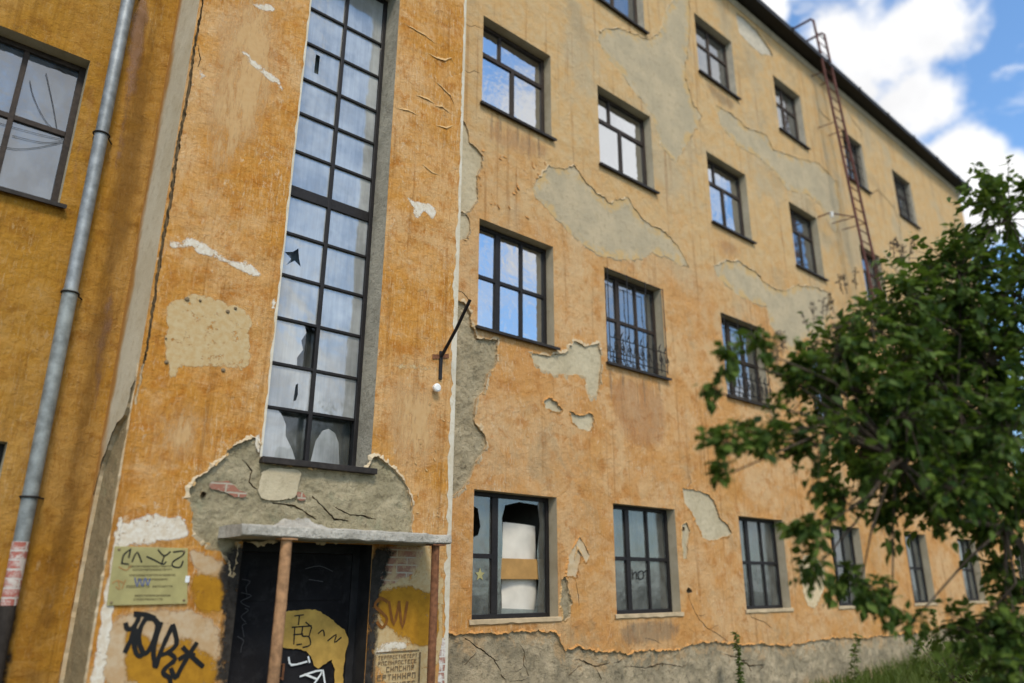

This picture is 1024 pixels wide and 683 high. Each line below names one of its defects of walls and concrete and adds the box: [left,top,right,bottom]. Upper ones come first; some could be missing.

peeling [242,52,282,89]
crack [136,0,204,405]
peeling [408,198,436,218]
peeling [170,238,260,276]
peeling [164,294,252,377]
spalling [437,0,976,683]
spalling [58,363,436,683]
crack [242,460,376,521]